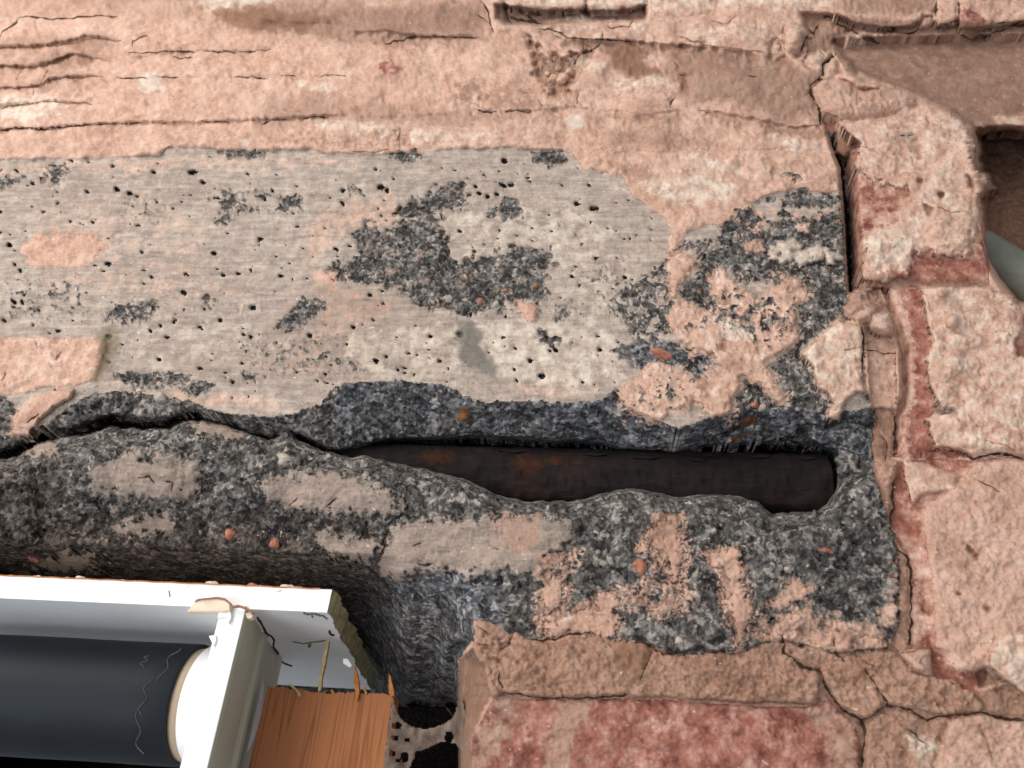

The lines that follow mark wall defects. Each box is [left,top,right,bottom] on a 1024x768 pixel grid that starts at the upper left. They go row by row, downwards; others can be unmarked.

crack [0,14,346,153]
crack [0,413,346,480]
spalling [0,118,901,709]
crack [679,410,1024,765]